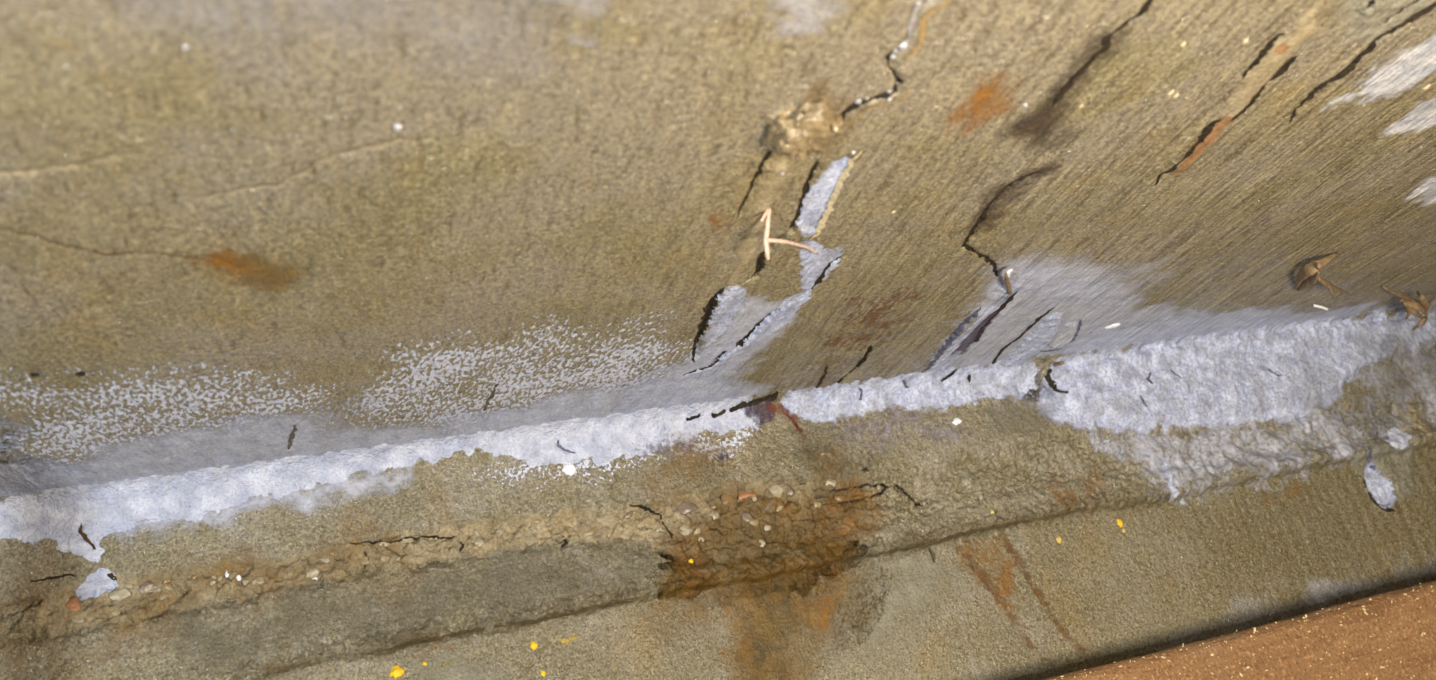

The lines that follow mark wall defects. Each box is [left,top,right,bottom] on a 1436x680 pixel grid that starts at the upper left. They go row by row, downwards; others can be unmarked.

crack [841,0,951,128]
crack [1052,0,1153,107]
crack [1156,0,1436,185]
crack [683,151,820,376]
crack [811,255,842,290]
crack [962,172,1041,276]
leakage [0,98,1436,602]
crack [816,346,873,388]
peeling [562,463,576,476]
spalling [1355,446,1413,512]
spalling [35,474,923,630]
corrosion [956,537,1085,650]